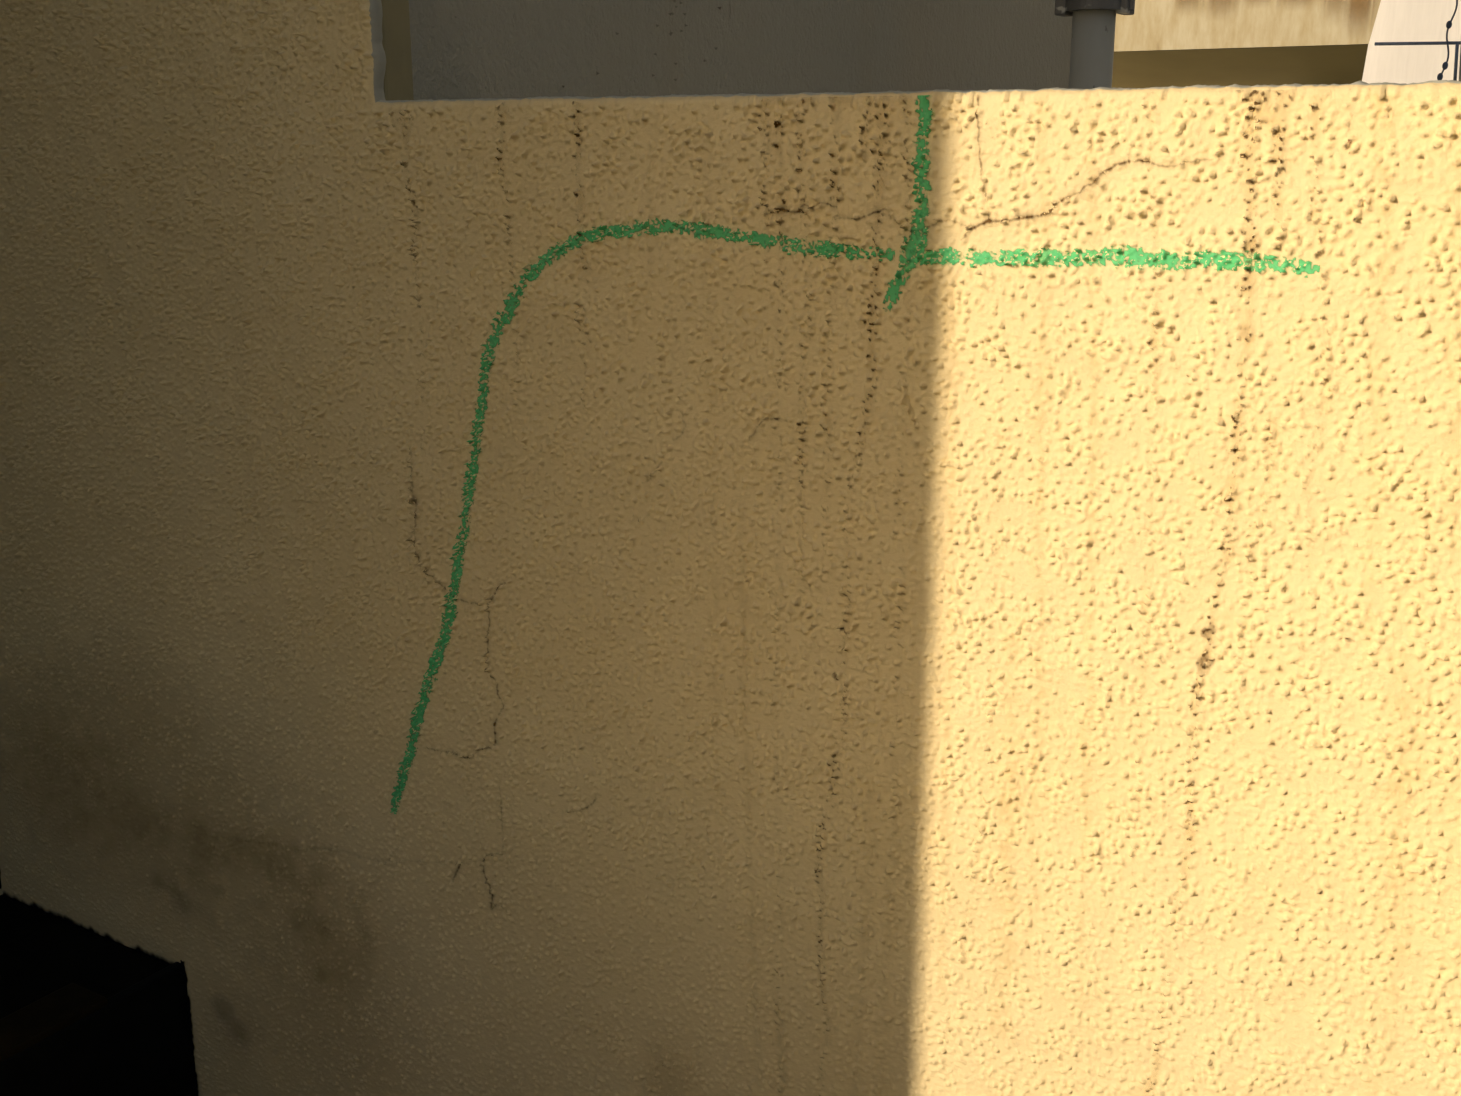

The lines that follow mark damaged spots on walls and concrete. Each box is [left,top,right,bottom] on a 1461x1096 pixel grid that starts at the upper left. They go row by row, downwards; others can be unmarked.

crack [770,203,881,219]
crack [929,159,1150,237]
damp [1238,90,1291,290]
damp [1190,596,1217,716]